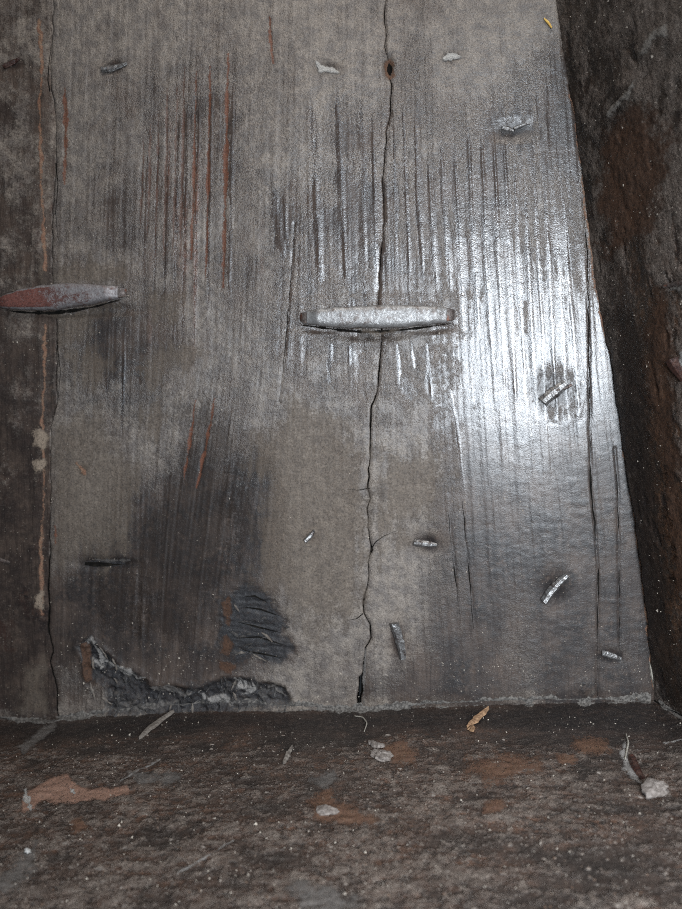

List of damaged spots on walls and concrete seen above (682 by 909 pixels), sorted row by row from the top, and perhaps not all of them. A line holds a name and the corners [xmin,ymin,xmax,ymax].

crack [382,10,395,203]
crack [347,328,395,704]
spalling [80,636,286,717]